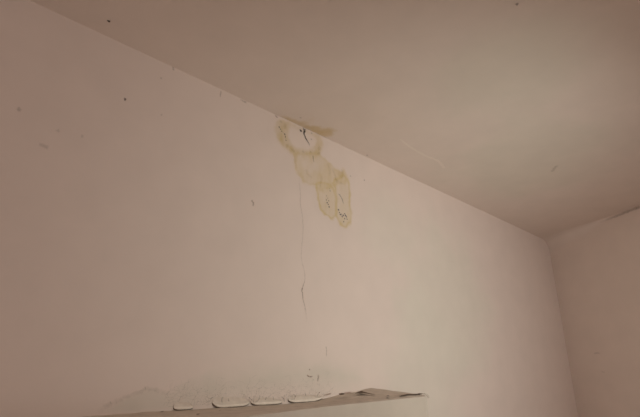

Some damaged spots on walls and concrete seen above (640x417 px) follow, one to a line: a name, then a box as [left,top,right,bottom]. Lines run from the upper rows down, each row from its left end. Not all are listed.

water stain [272,113,355,232]